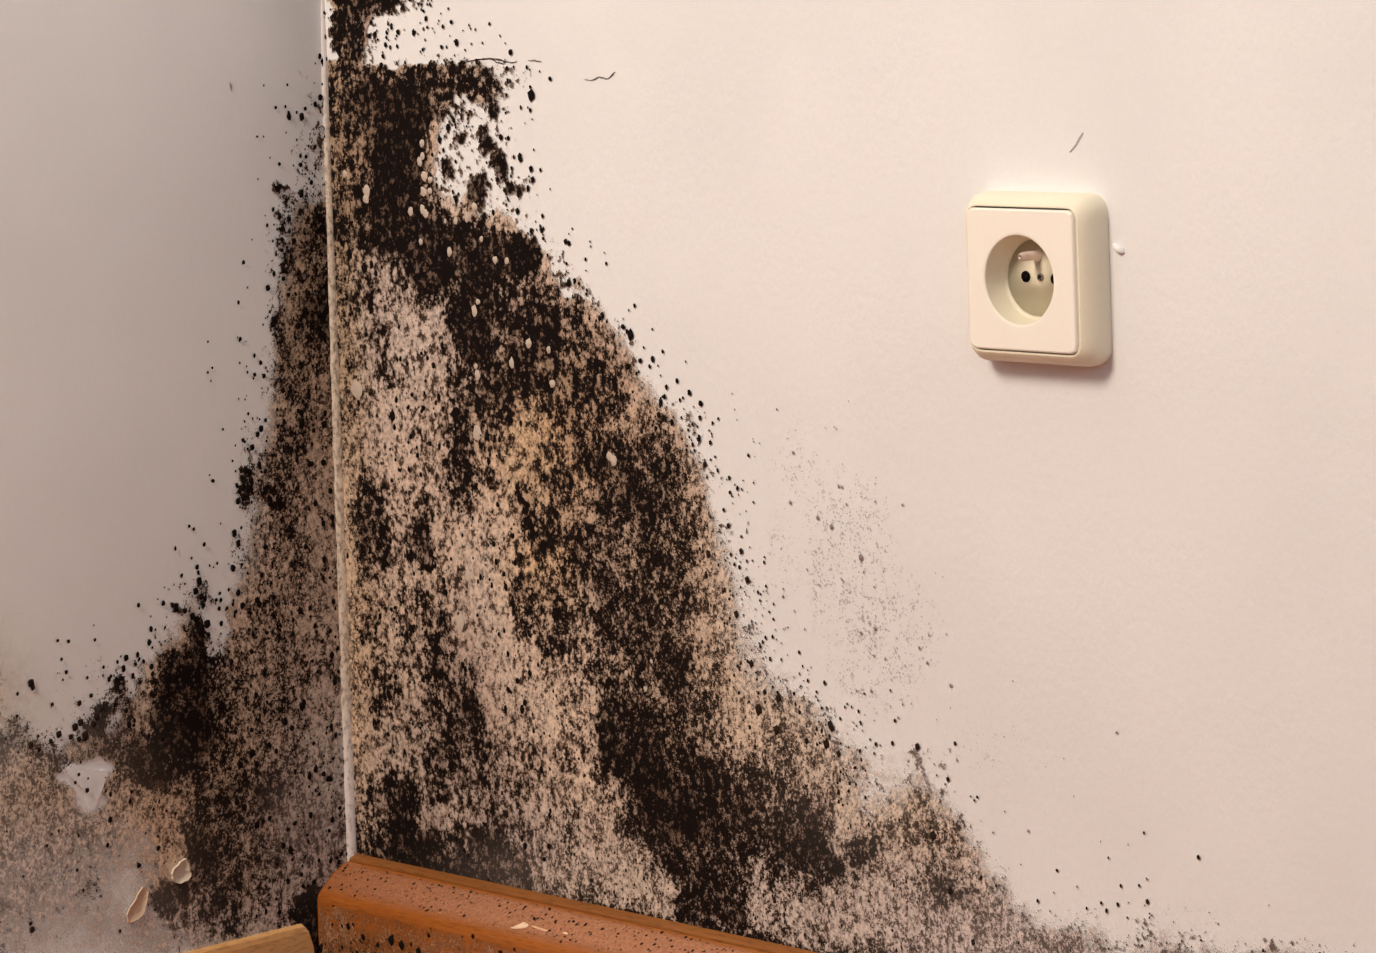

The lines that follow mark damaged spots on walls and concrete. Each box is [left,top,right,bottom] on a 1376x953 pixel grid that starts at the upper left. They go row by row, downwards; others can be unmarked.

peeling [67,764,107,811]
leakage [0,94,530,953]
leakage [315,0,1228,953]
leakage [1234,936,1312,953]